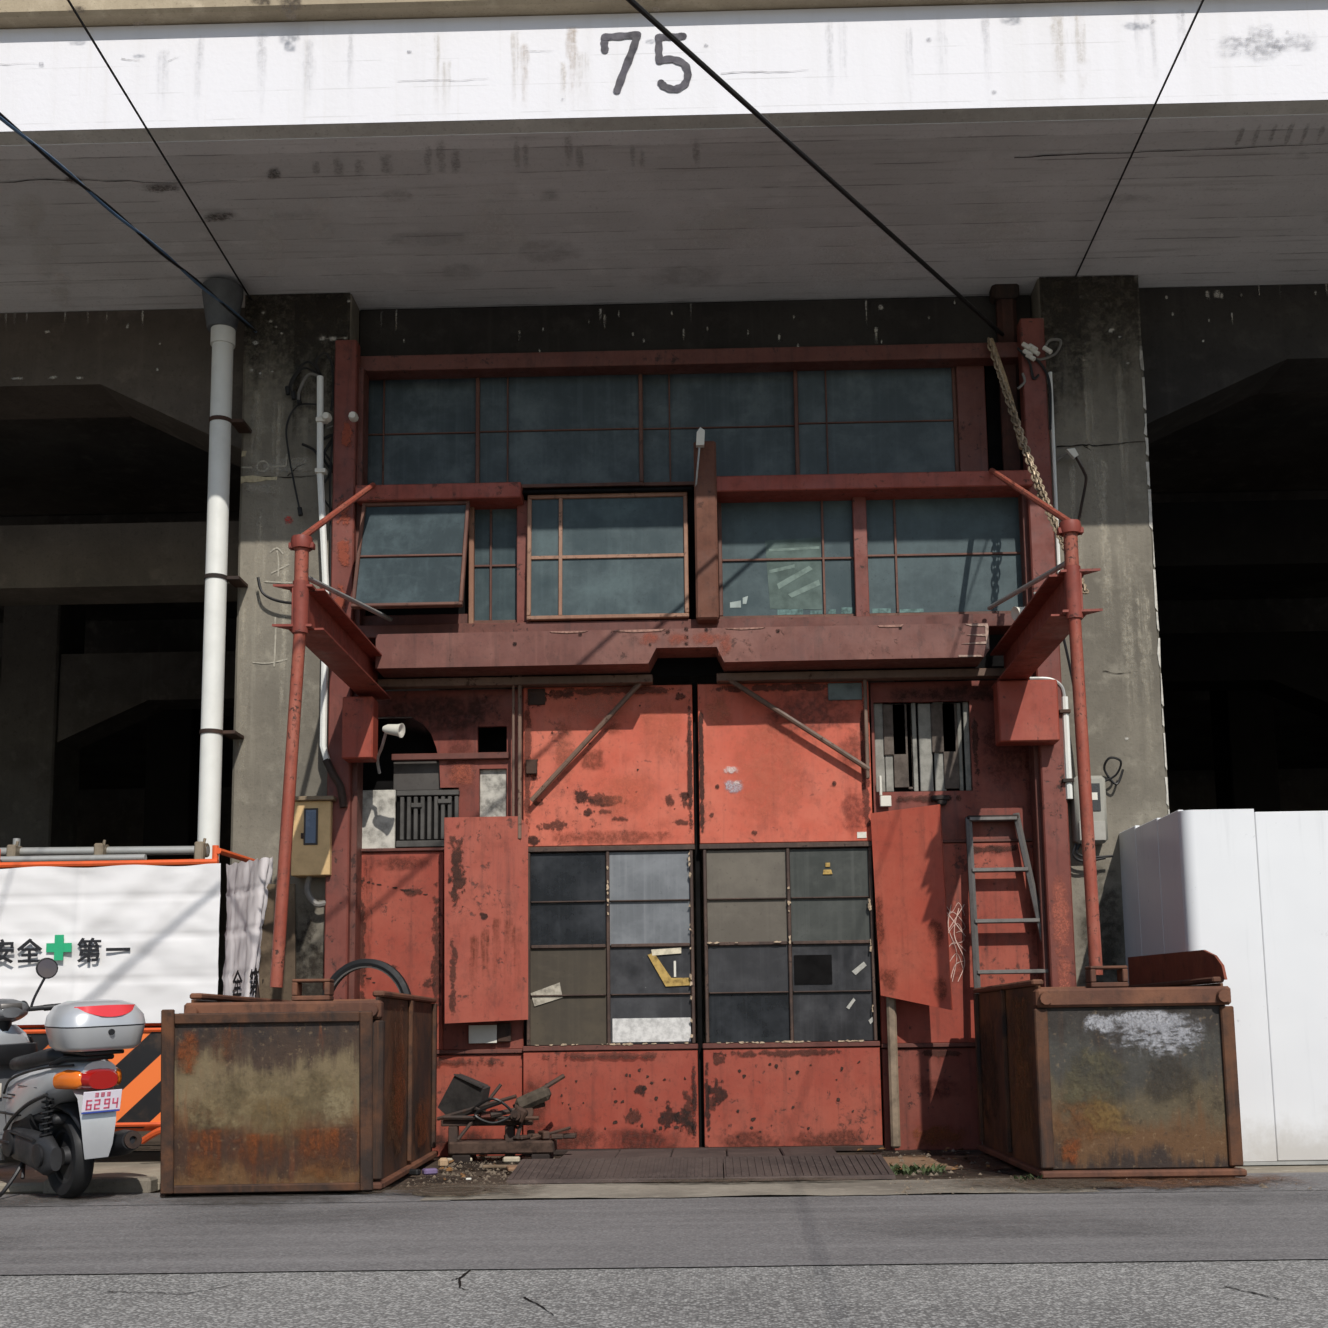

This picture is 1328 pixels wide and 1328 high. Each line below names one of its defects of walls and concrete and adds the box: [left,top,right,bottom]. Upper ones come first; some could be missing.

rust [524,701,532,829]
rust [687,699,705,833]
rust [860,706,871,827]
rust [431,882,442,1006]
rust [625,1085,646,1123]
rust [658,1048,840,1142]
crack [452,1269,473,1292]